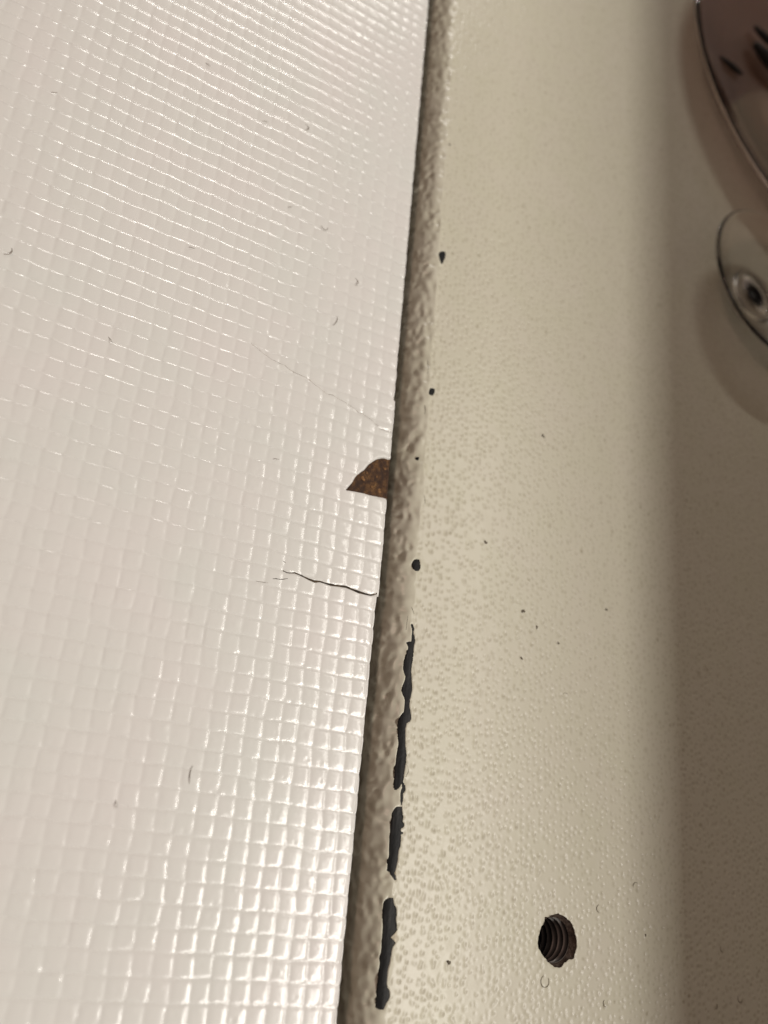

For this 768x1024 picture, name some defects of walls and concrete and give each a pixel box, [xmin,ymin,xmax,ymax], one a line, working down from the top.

corrosion [346,458,390,499]
crack [257,561,377,596]
peeling [387,624,415,880]
peeling [375,898,398,1010]